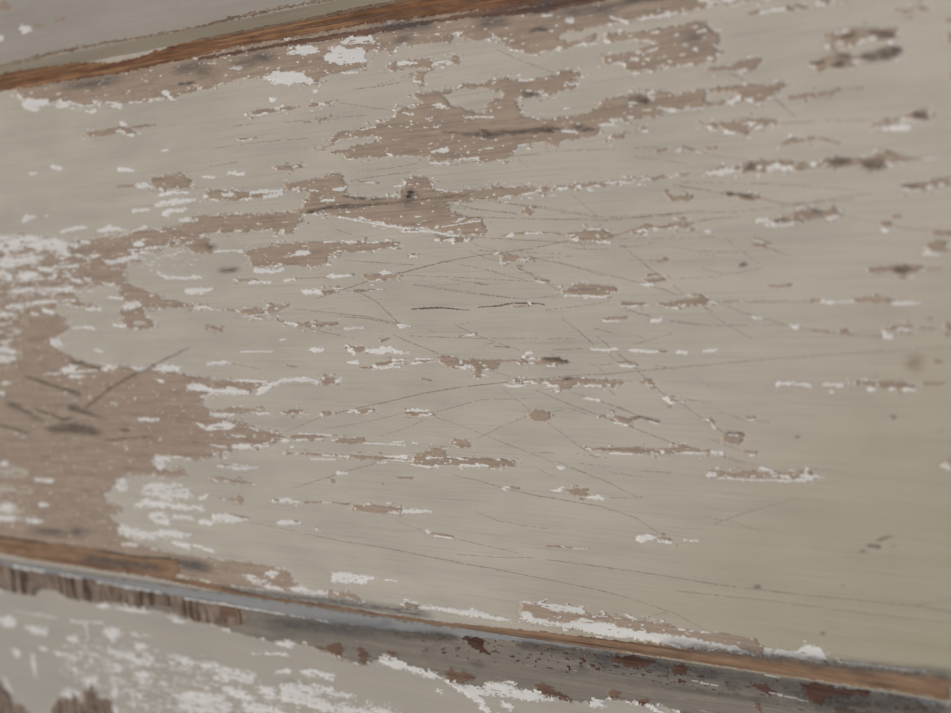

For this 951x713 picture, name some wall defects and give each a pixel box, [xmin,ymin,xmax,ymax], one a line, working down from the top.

peeling [809,0,928,72]
peeling [870,107,935,132]
peeling [0,0,863,341]
peeling [702,133,941,178]
peeling [863,225,951,279]
crack [411,301,544,310]
peeling [44,364,117,380]
peeling [344,337,624,402]
peeling [590,347,689,368]
peeling [776,376,946,395]
peeling [583,418,822,484]
peeling [0,454,951,713]